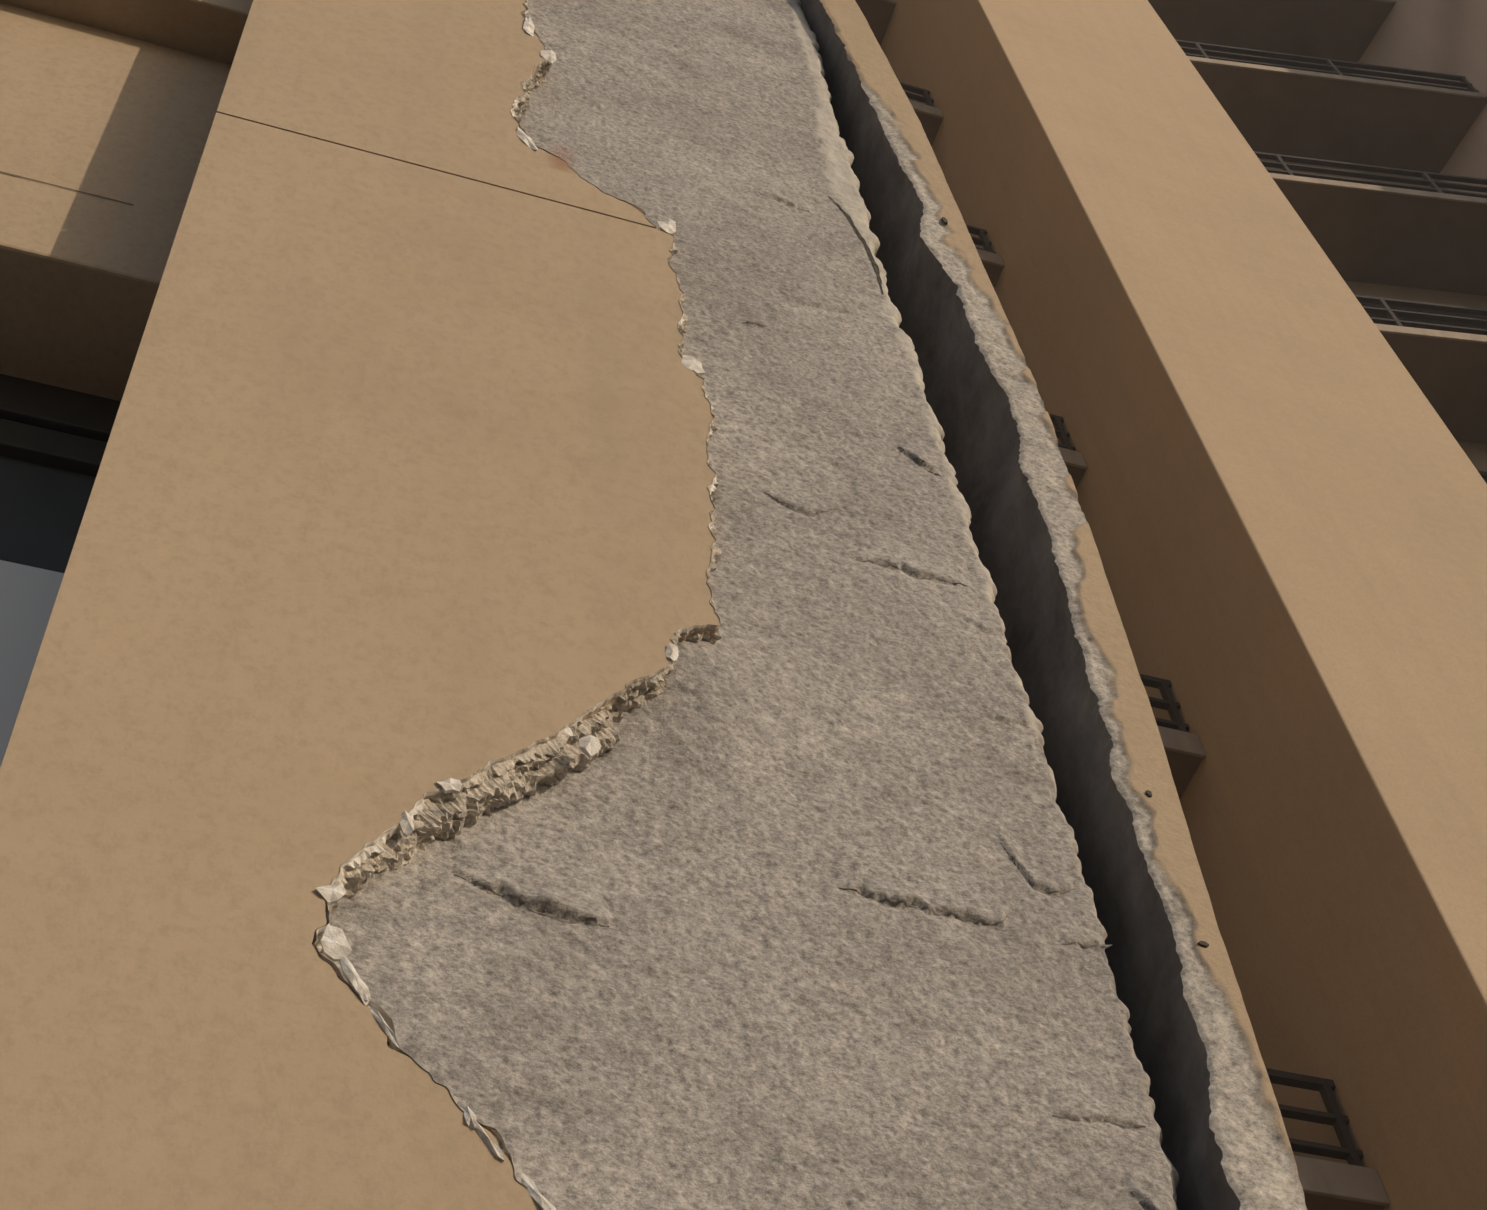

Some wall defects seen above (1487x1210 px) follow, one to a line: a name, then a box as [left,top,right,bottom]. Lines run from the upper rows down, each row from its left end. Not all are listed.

spalling [312,0,1179,1210]
crack [800,0,1241,1210]